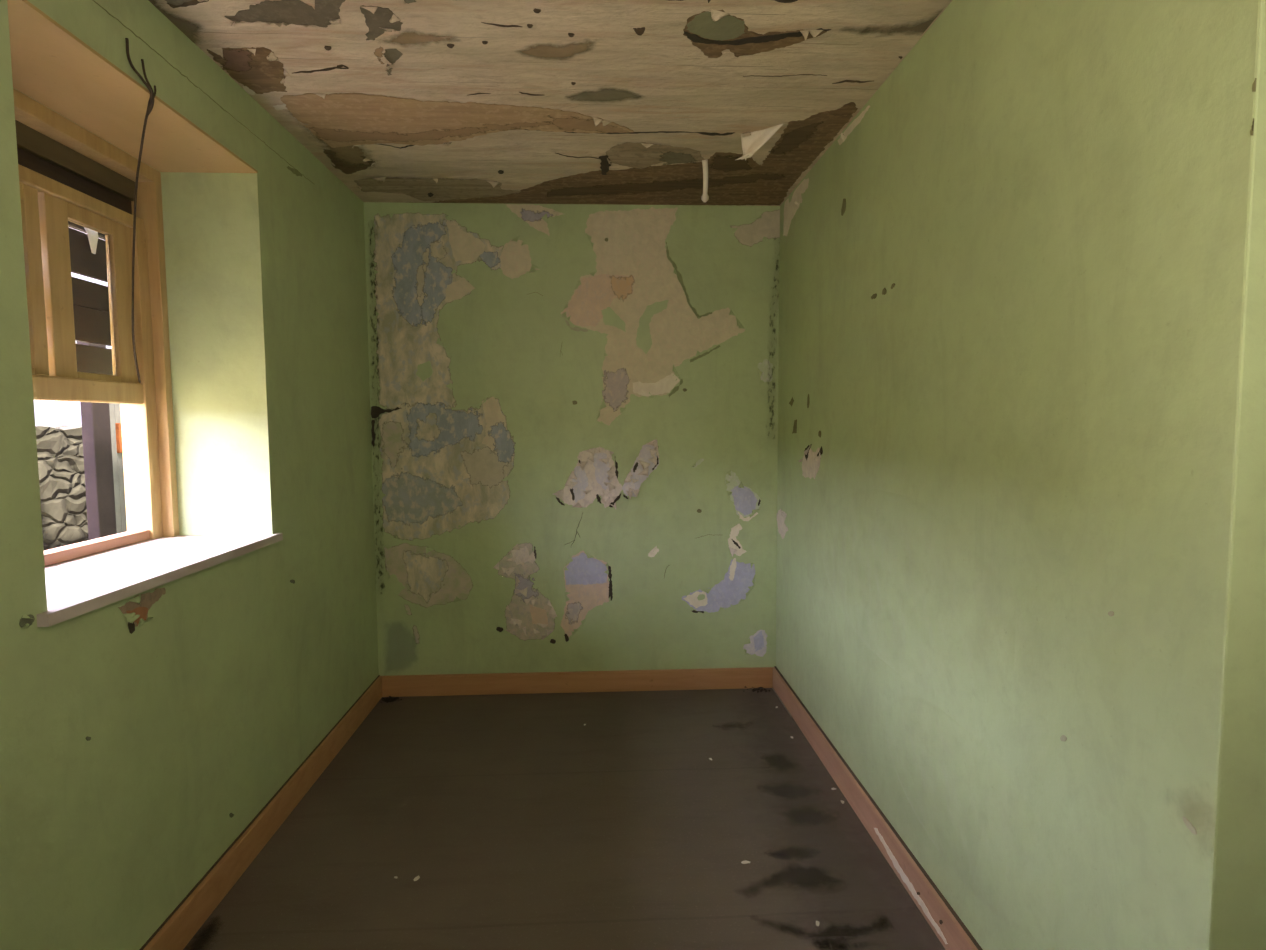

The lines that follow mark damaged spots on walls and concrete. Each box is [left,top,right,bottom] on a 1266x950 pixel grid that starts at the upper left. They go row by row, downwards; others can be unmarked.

peeling [165,0,209,8]
peeling [221,0,345,28]
peeling [360,5,403,75]
peeling [207,47,870,540]
peeling [682,470,761,613]
flaking render [118,587,166,634]
peeling [493,543,613,644]